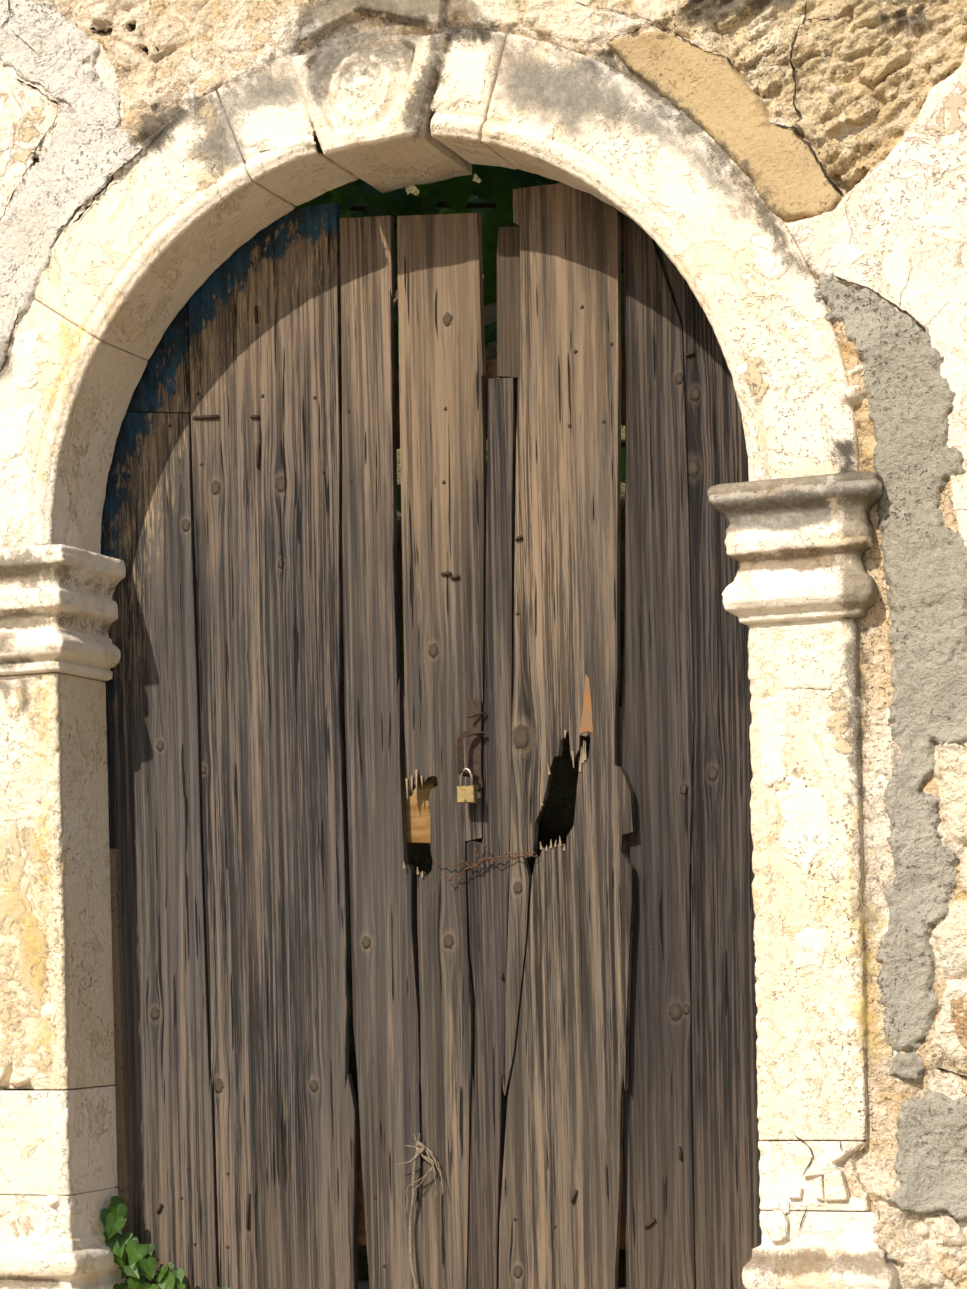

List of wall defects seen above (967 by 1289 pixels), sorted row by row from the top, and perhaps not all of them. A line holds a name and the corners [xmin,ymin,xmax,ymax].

flaking render [0,89,57,178]
crack [771,0,843,194]
flaking render [655,0,967,194]
peeling [10,330,40,393]
flaking render [5,675,52,743]
flaking render [0,815,58,1073]
flaking render [844,894,896,1052]
flaking render [949,997,967,1049]
flaking render [0,1207,33,1240]
crack [786,1135,841,1233]